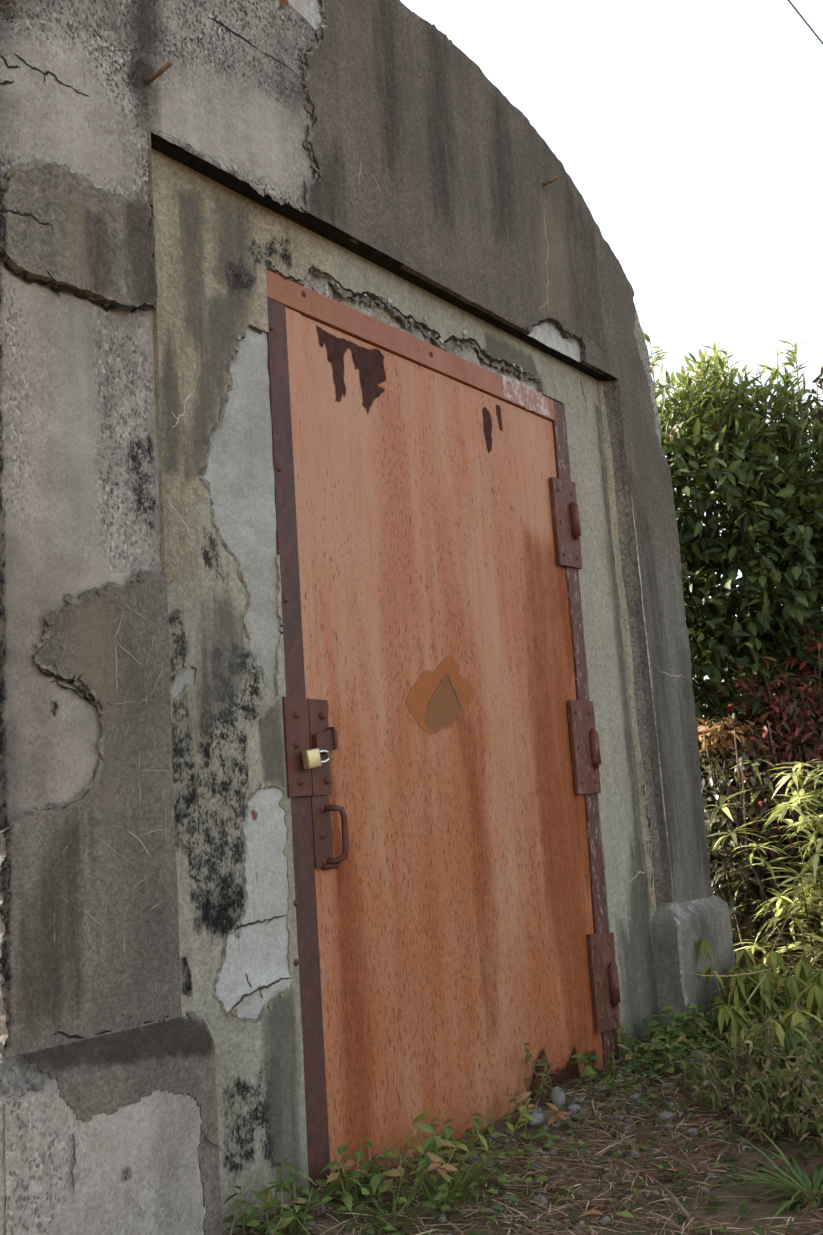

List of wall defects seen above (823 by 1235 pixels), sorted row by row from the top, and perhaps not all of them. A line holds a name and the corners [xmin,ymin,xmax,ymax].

crack [0,54,88,96]
spalling [0,0,328,213]
crack [0,246,151,313]
rust [316,326,386,414]
rust [483,405,502,452]
spalling [0,257,164,828]
peeling [197,326,281,694]
crack [38,667,104,717]
leakage [172,605,283,939]
peeling [212,783,292,1023]
crack [228,974,292,1013]
rust [530,1048,596,1101]